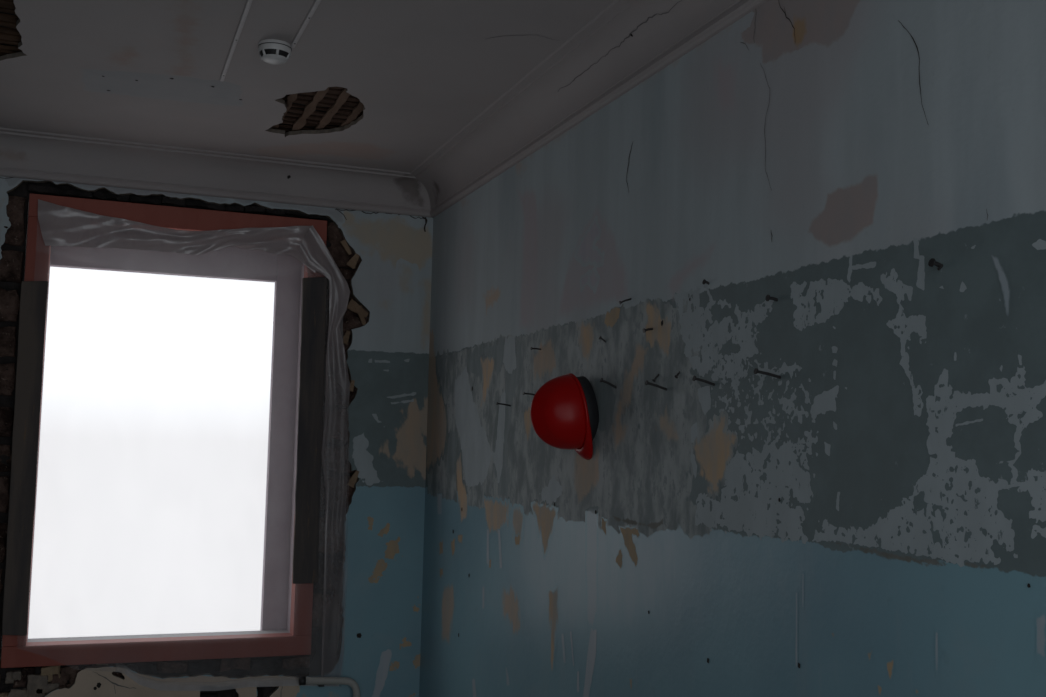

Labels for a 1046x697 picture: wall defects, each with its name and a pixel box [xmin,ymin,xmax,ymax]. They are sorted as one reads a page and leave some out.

spalling [0,0,22,56]
spalling [271,87,364,134]
crack [898,20,928,123]
peeling [0,170,1046,697]